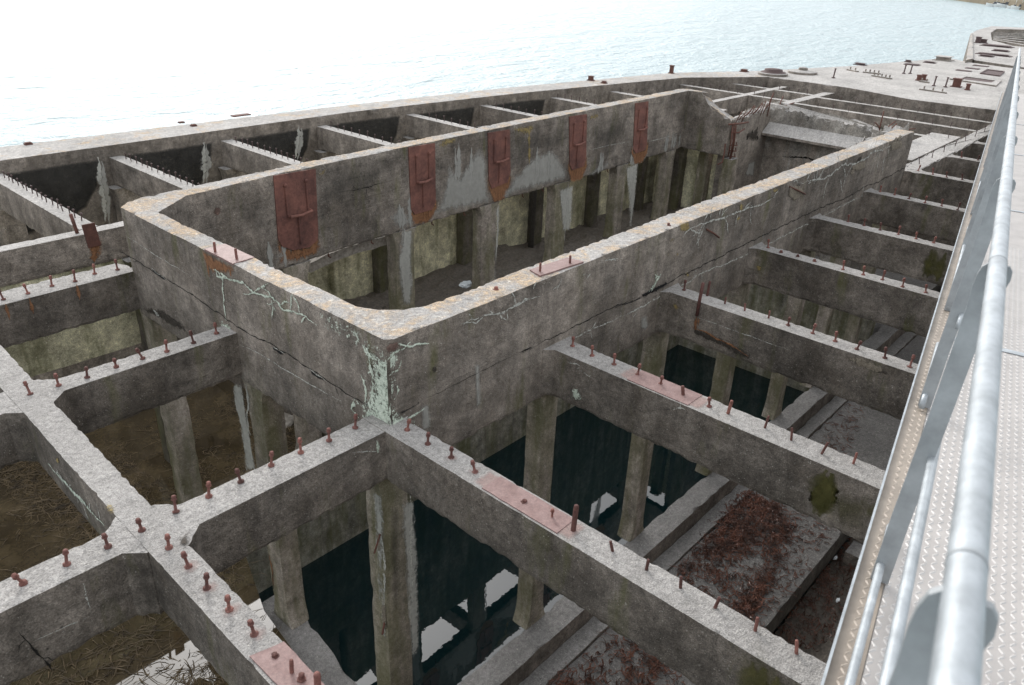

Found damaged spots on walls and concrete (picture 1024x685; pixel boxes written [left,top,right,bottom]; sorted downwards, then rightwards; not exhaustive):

crack [120,241,368,406]
crack [425,134,912,399]